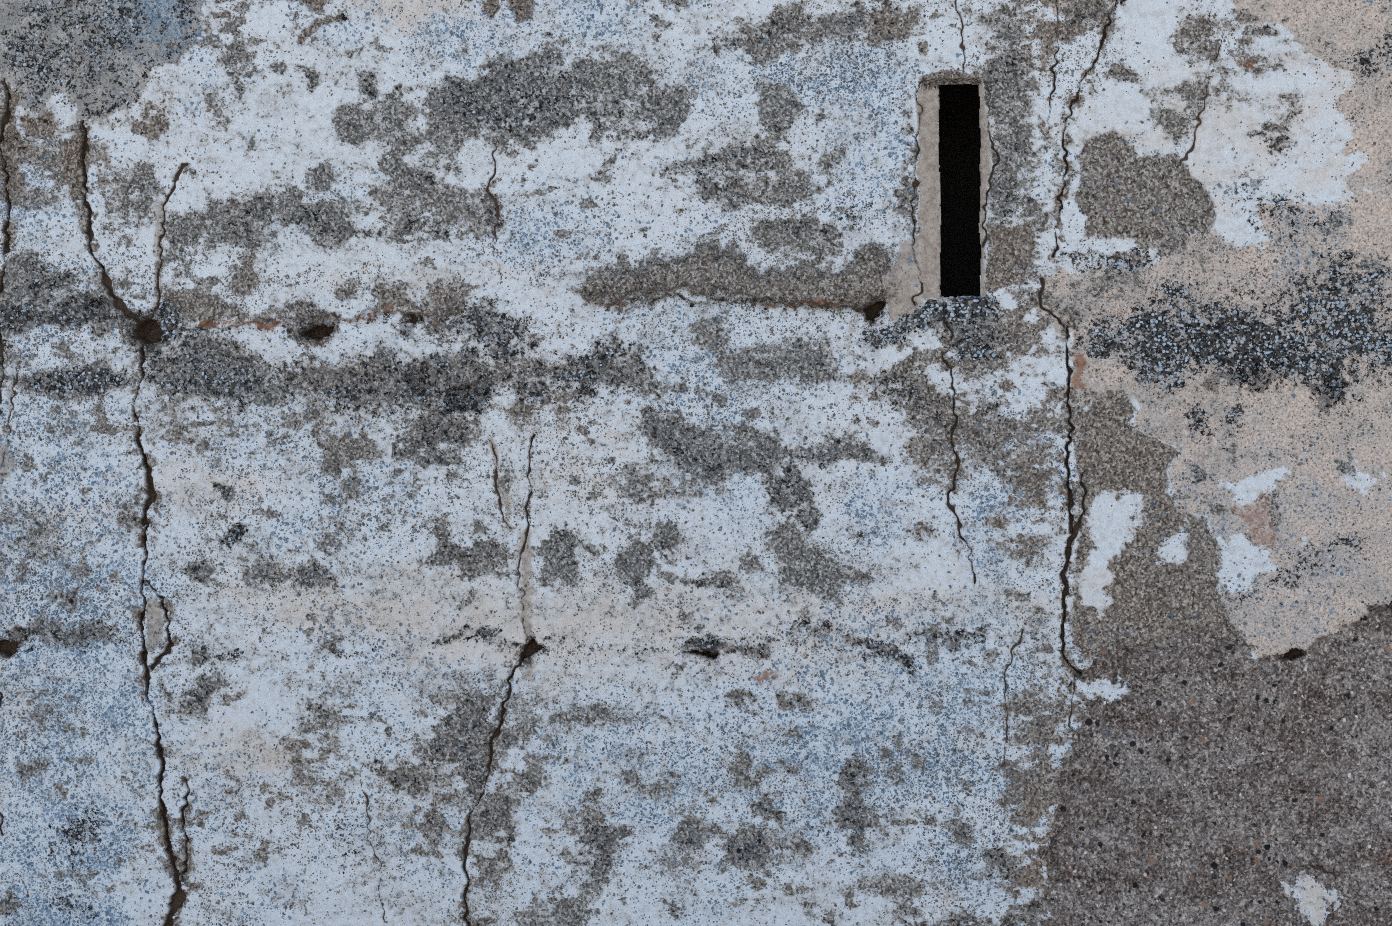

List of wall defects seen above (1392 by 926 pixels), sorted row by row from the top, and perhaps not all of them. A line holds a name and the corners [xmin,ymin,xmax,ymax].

crack [0,812,8,837]
crack [0,78,19,469]
crack [6,869,14,904]
crack [79,119,190,926]
crack [460,434,536,926]
crack [909,77,976,586]
crack [953,0,1000,248]
crack [999,628,1025,769]
crack [1038,0,1118,732]
spalling [880,0,1392,926]
crack [1179,15,1226,164]